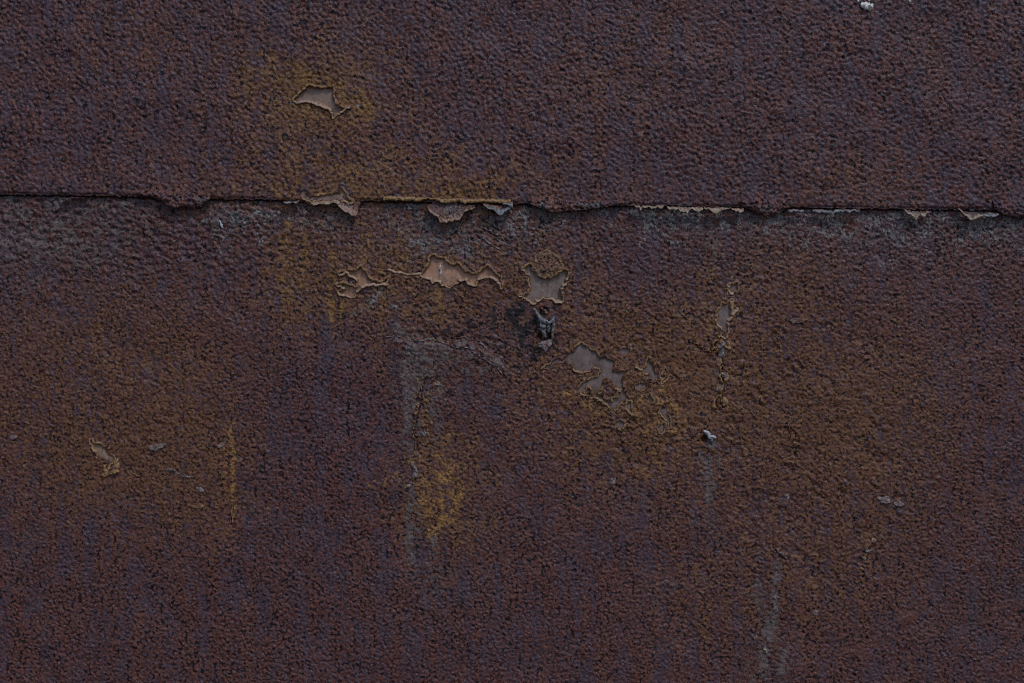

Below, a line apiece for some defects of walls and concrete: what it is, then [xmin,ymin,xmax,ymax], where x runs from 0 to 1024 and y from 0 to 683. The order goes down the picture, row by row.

peeling [291,82,361,120]
rust [237,49,527,361]
rust [631,204,744,214]
rust [904,209,931,220]
rust [958,208,999,221]
peeling [333,252,506,299]
peeling [517,249,572,314]
peeling [537,339,671,432]
rust [217,420,239,517]
rust [367,365,495,550]
rust [877,496,905,506]